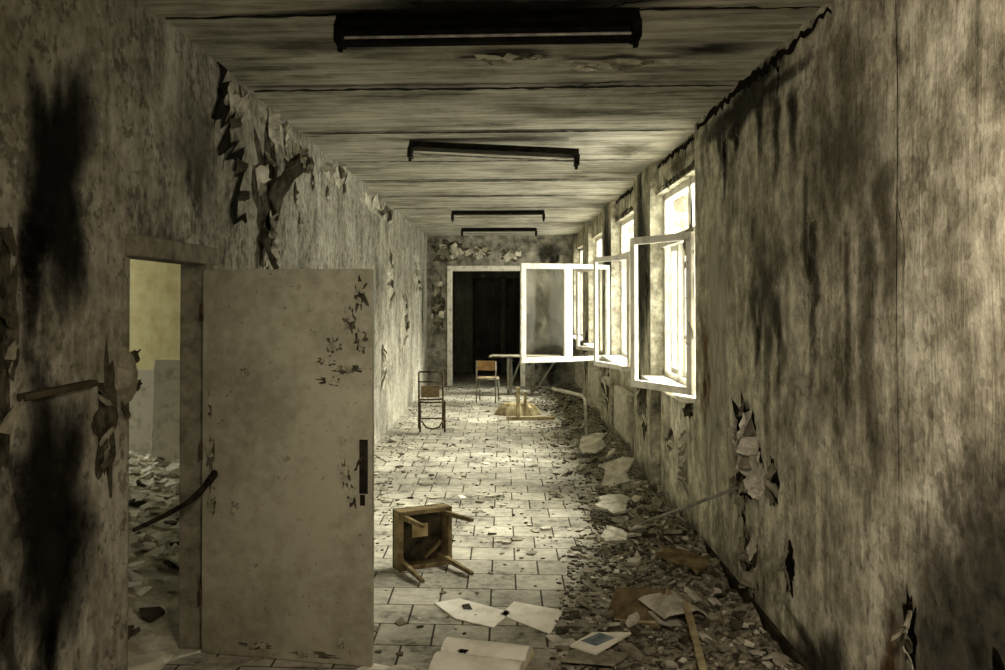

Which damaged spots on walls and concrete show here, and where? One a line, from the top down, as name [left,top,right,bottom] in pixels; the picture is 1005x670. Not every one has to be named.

spalling [225,82,348,270]
leakage [708,59,797,190]
leakage [820,66,866,194]
peeling [358,191,446,354]
peeling [431,239,522,263]
leakage [751,253,784,378]
leakage [845,233,874,353]
spalling [727,392,780,507]
spalling [734,521,759,602]
spalling [778,540,795,598]
leakage [909,476,1005,670]
leakage [792,622,844,670]